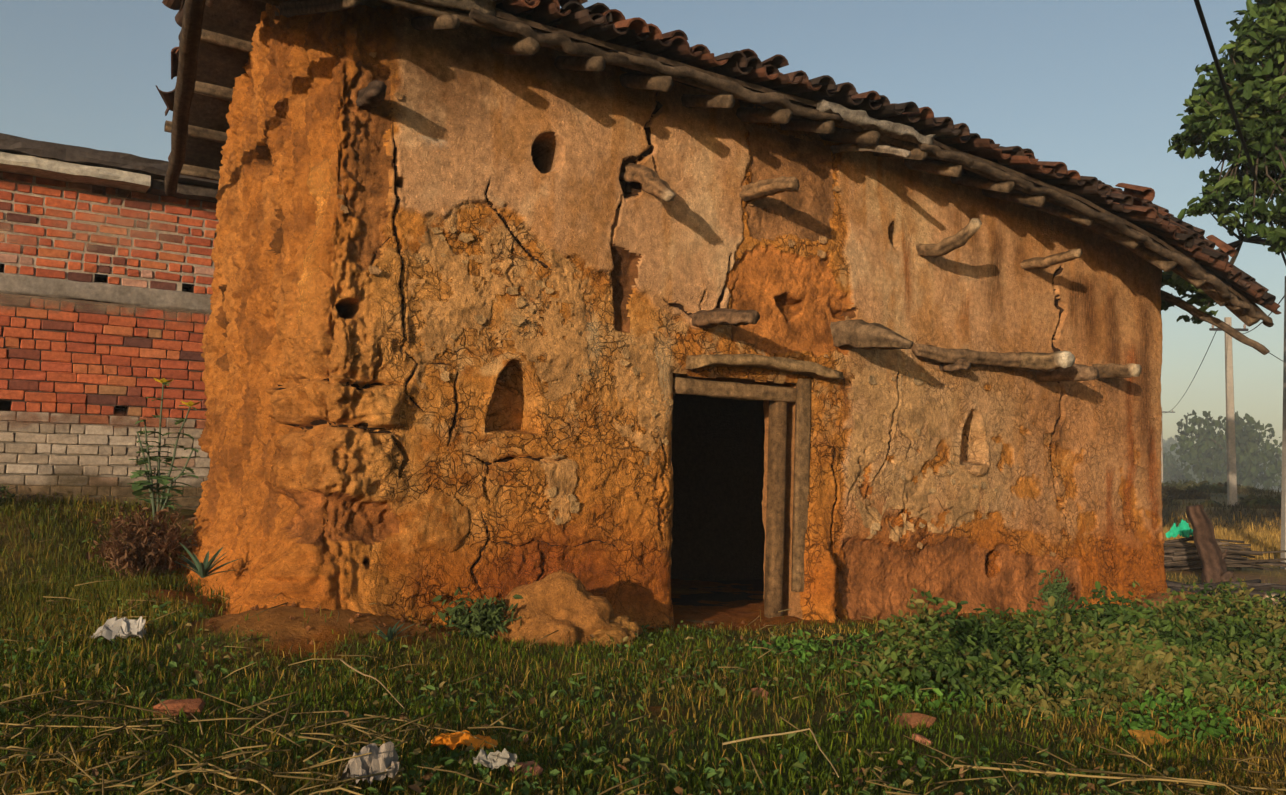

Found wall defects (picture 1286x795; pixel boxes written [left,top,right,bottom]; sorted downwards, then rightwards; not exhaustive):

spalling [336,52,408,275]
spalling [531,131,566,174]
spalling [619,155,642,198]
crack [637,92,663,161]
spalling [335,297,365,319]
crack [276,125,621,590]
peeling [408,226,592,401]
peeling [610,244,673,467]
spalling [725,122,1083,620]
crack [1050,266,1064,462]
spalling [275,486,400,569]
peeling [540,453,580,525]